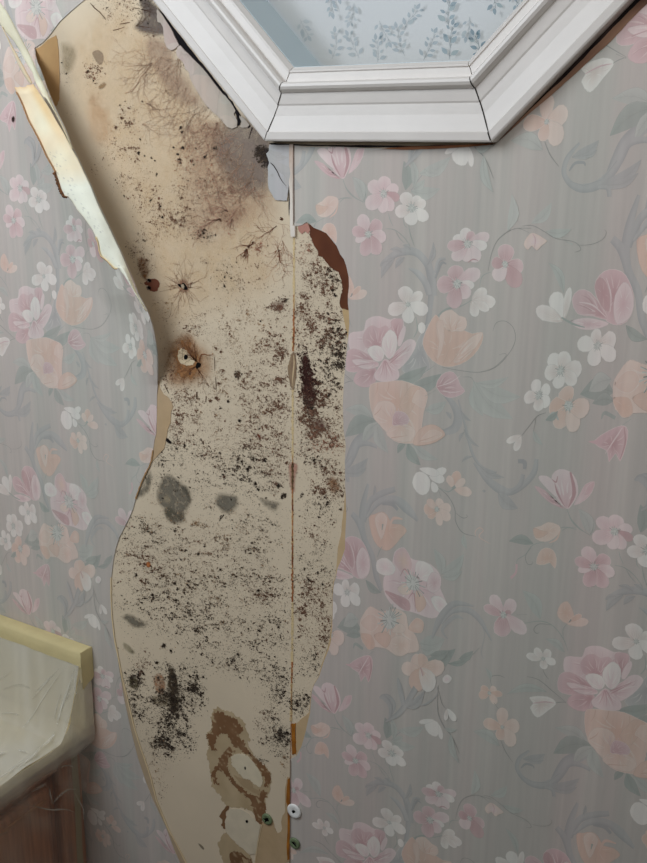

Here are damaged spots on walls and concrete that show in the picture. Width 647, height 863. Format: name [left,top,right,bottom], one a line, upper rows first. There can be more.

water stain [78,0,347,798]
peeling [206,706,272,863]